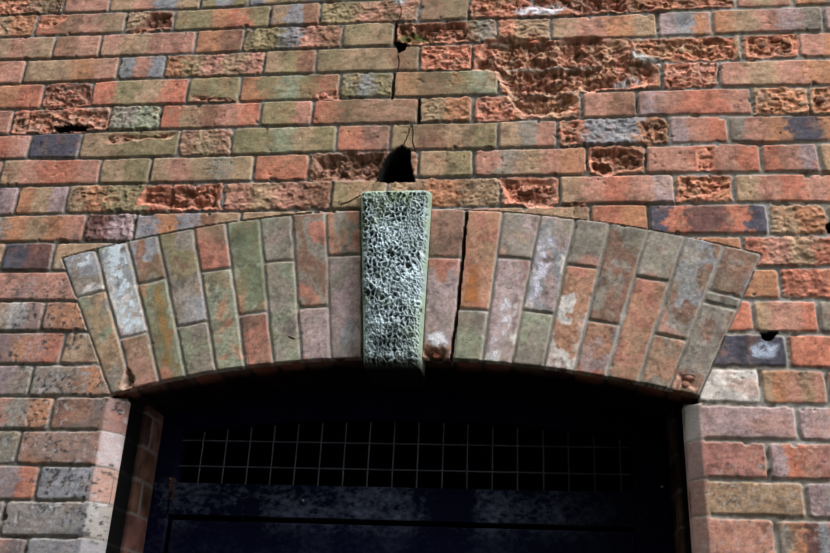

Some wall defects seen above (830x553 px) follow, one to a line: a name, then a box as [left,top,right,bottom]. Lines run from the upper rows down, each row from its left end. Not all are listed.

spalling [11,84,178,145]
spalling [135,183,224,214]
spalling [308,149,390,184]
crack [390,0,402,100]
crack [403,98,422,152]
spalling [499,177,587,211]
spalling [396,0,800,148]
spalling [586,118,669,177]
spalling [674,146,732,202]
spalling [752,86,830,117]
crack [451,211,469,366]